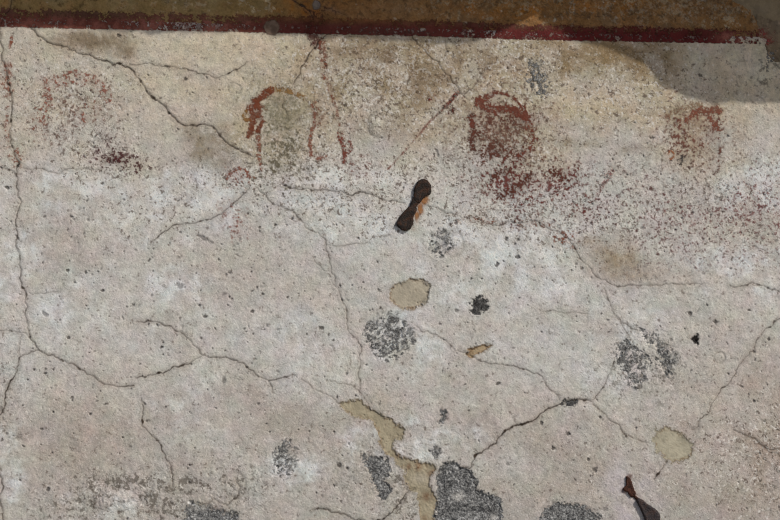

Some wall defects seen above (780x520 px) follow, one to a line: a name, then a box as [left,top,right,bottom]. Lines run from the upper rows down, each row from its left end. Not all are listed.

crack [75,50,250,164]
crack [470,399,587,468]